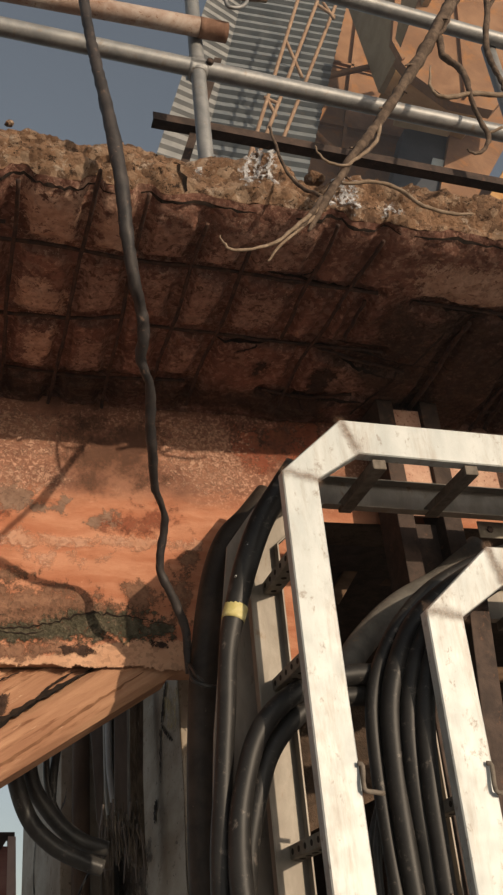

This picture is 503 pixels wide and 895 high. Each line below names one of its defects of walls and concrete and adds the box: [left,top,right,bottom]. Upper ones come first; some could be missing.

crack [0,171,114,194]
crack [141,161,255,213]
water stain [238,149,279,186]
water stain [329,176,362,216]
spalling [0,128,130,372]
spalling [122,141,503,382]
crack [296,214,503,250]
peeling [0,407,74,517]
water stain [68,415,161,490]
corrosion [98,502,179,536]
water stain [0,637,87,665]
crack [0,667,143,767]